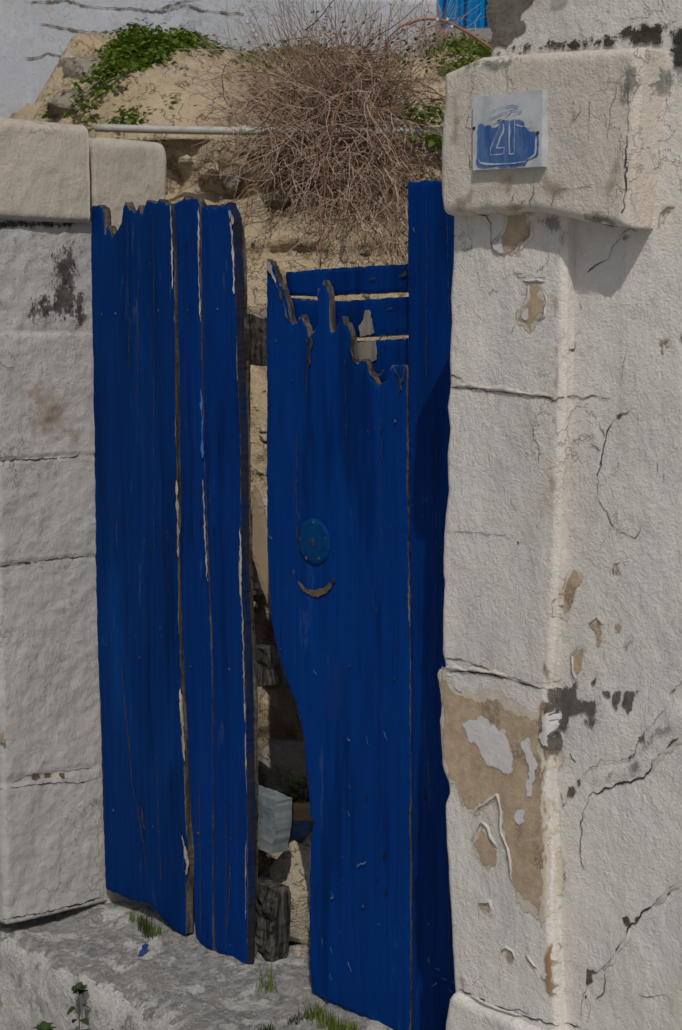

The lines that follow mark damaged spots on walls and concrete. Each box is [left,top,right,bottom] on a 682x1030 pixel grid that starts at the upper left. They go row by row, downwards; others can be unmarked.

crack [25,0,244,33]
peeling [485,0,533,48]
crack [573,68,630,272]
peeling [491,207,534,258]
peeling [515,278,547,333]
peeling [660,333,682,354]
crack [450,349,642,539]
crack [1,556,85,567]
peeling [549,569,583,621]
crack [0,767,98,789]
peeling [437,615,638,927]
crack [560,681,682,870]